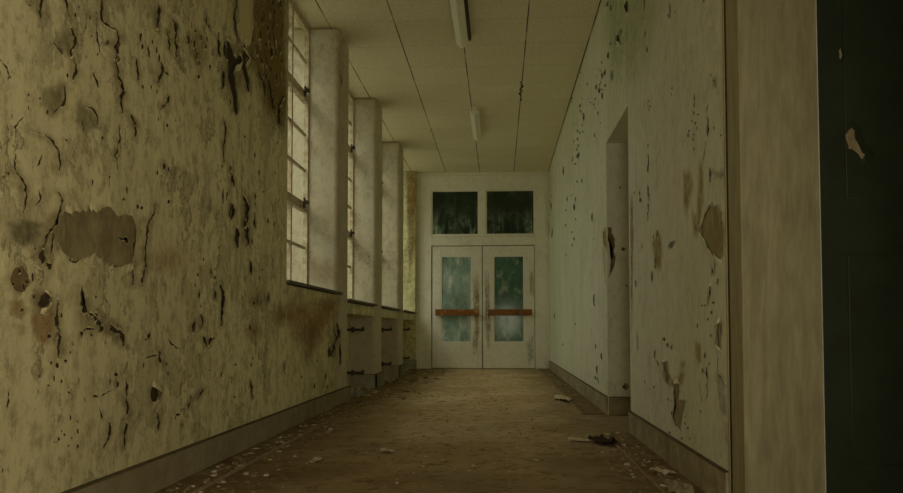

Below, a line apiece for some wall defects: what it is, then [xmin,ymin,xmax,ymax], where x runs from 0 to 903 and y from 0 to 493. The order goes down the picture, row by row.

peeling [187,0,286,126]
spalling [56,186,143,288]
peeling [222,188,275,253]
spalling [607,227,626,276]
spalling [699,197,723,268]
peeling [10,256,126,395]
spalling [151,380,162,409]
spalling [653,337,691,440]